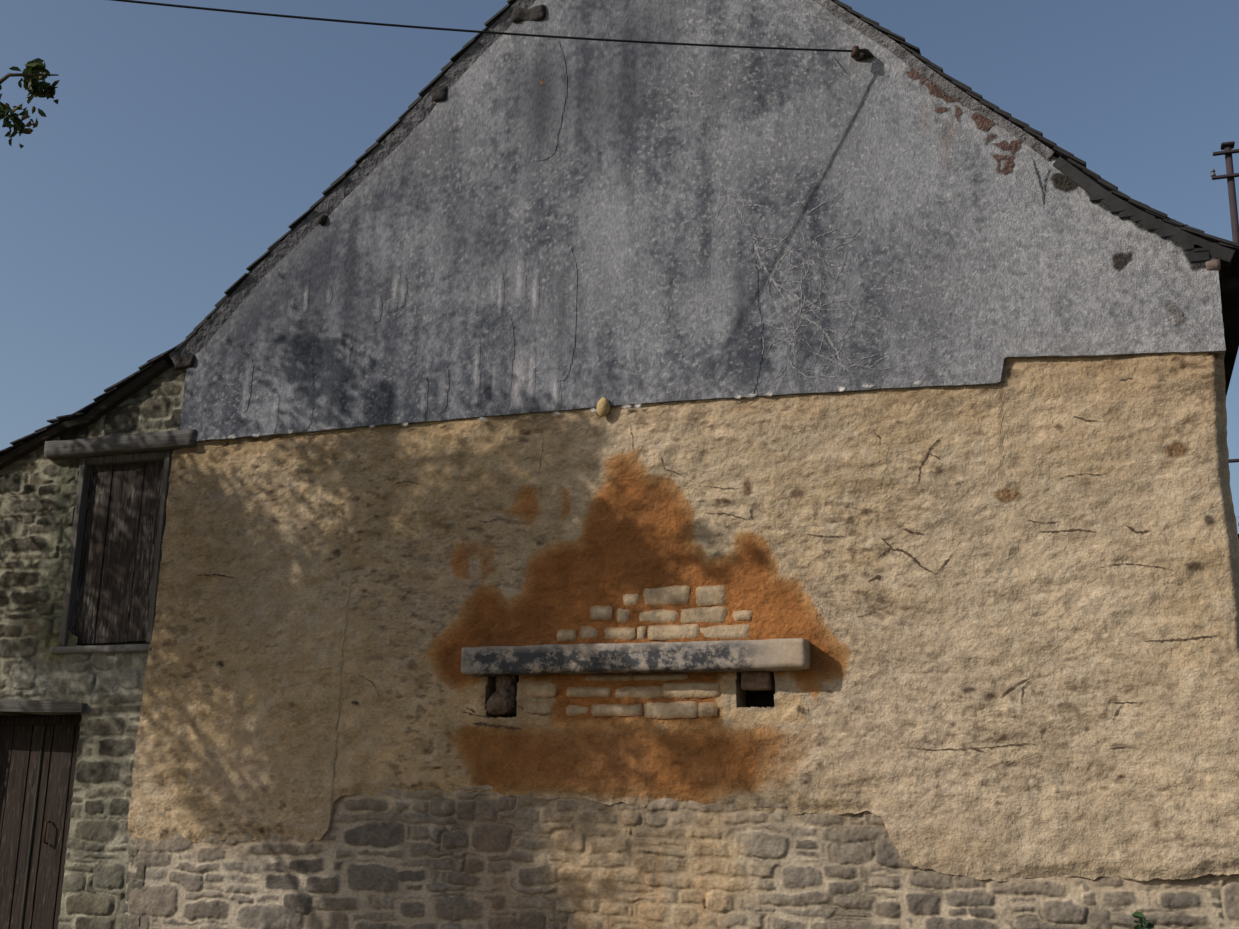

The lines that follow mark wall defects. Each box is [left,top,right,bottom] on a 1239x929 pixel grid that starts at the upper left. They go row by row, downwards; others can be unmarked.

water stain [524,38,567,161]
peeling [907,68,1022,174]
water stain [373,266,408,323]
water stain [470,242,577,415]
water stain [721,224,763,397]
water stain [269,335,352,434]
crack [918,438,941,483]
flaking render [556,585,752,641]
crack [862,528,953,616]
flaking render [523,673,720,719]
crack [1000,677,1030,704]